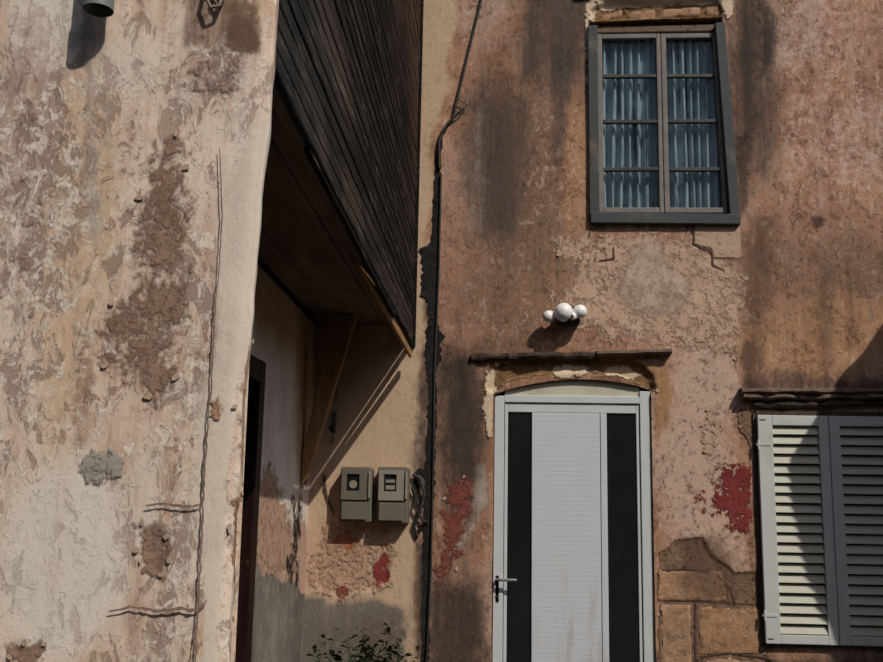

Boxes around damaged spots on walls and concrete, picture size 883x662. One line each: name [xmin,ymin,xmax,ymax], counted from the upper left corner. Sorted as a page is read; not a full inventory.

spalling [584,0,735,92]
damp [740,0,775,114]
flaking render [95,130,196,408]
crack [693,226,742,270]
flaking render [481,225,756,438]
flaking render [210,339,254,604]
peeling [432,474,487,598]
spalling [657,534,772,662]
peeling [689,462,755,534]